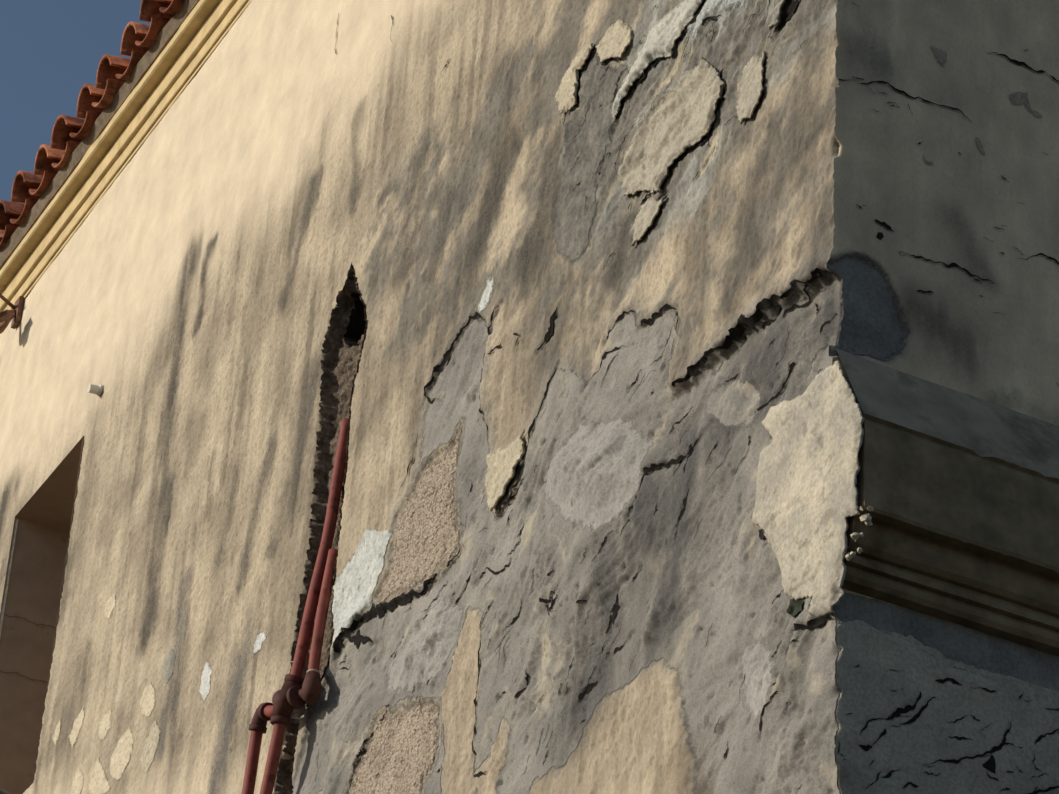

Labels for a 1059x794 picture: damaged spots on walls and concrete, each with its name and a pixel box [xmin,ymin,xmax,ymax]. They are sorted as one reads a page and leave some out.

peeling [551,0,702,262]
crack [563,0,721,208]
peeling [618,51,767,246]
crack [628,0,805,210]
peeling [768,0,786,30]
crack [837,76,969,119]
crack [989,49,1059,82]
crack [856,204,1002,314]
crack [983,225,1059,264]
spalling [292,252,1059,794]
crack [838,669,1059,794]